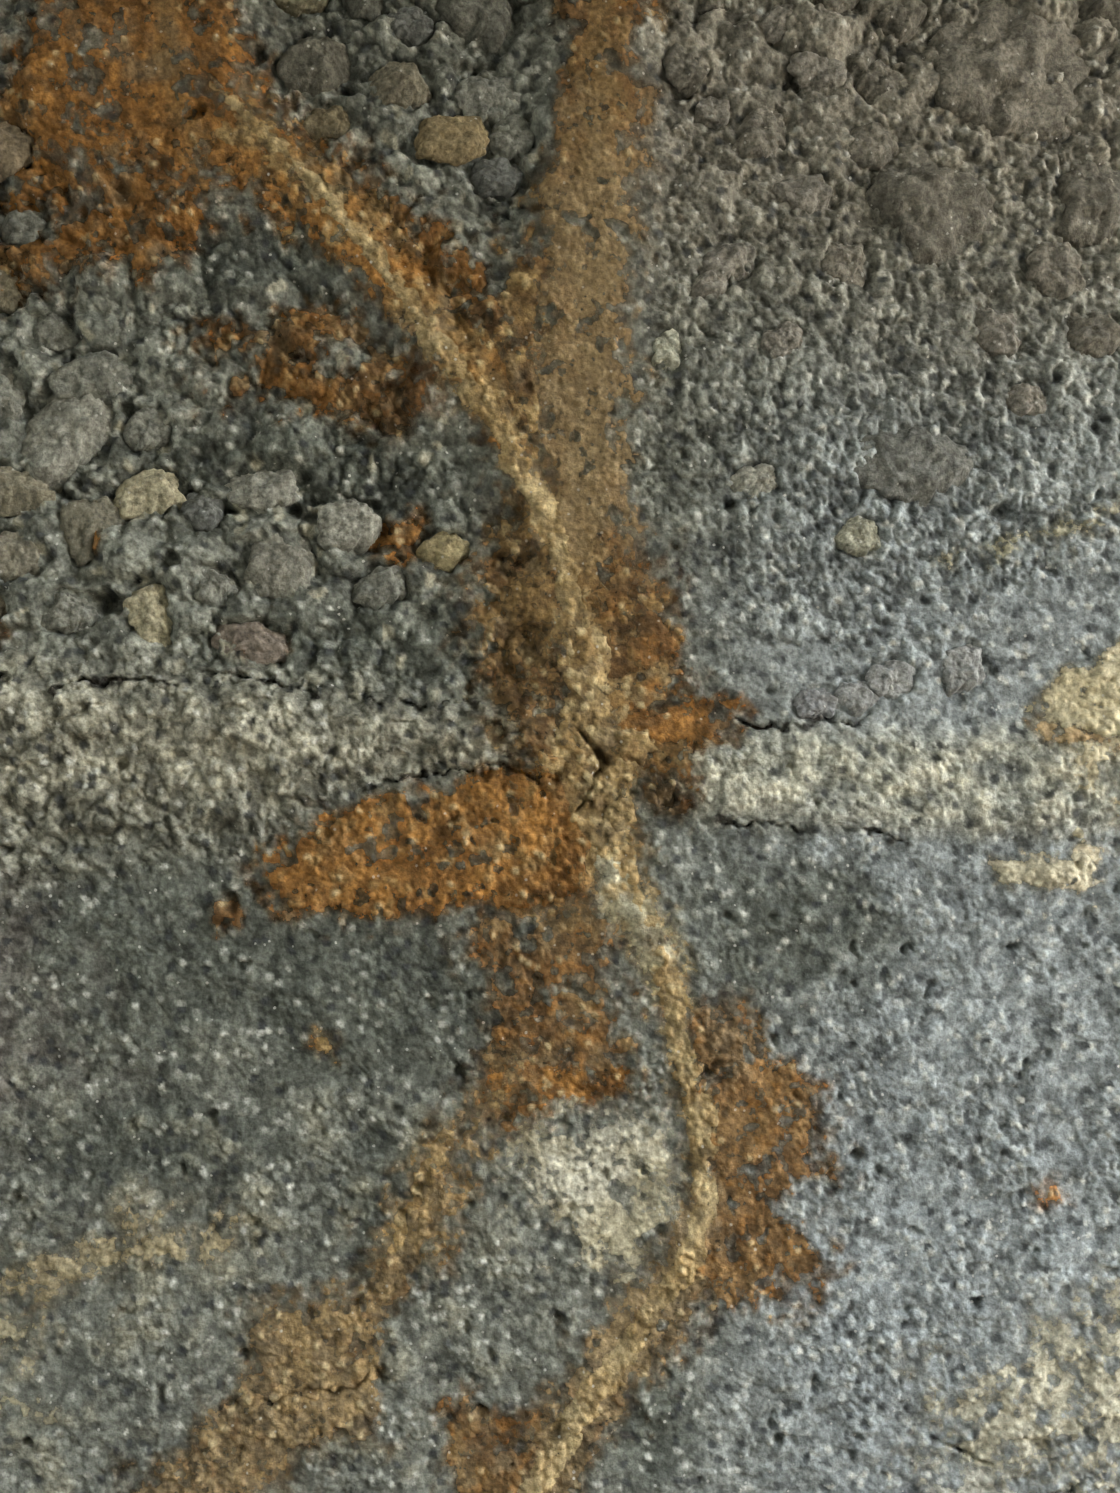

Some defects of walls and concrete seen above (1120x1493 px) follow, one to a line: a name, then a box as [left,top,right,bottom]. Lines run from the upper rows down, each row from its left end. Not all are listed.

rust [0,0,759,1141]
crack [48,676,165,697]
crack [735,715,856,733]
crack [209,80,719,1493]
crack [711,813,804,836]
crack [863,827,909,846]
rust [657,990,855,1363]
rust [432,1386,552,1493]